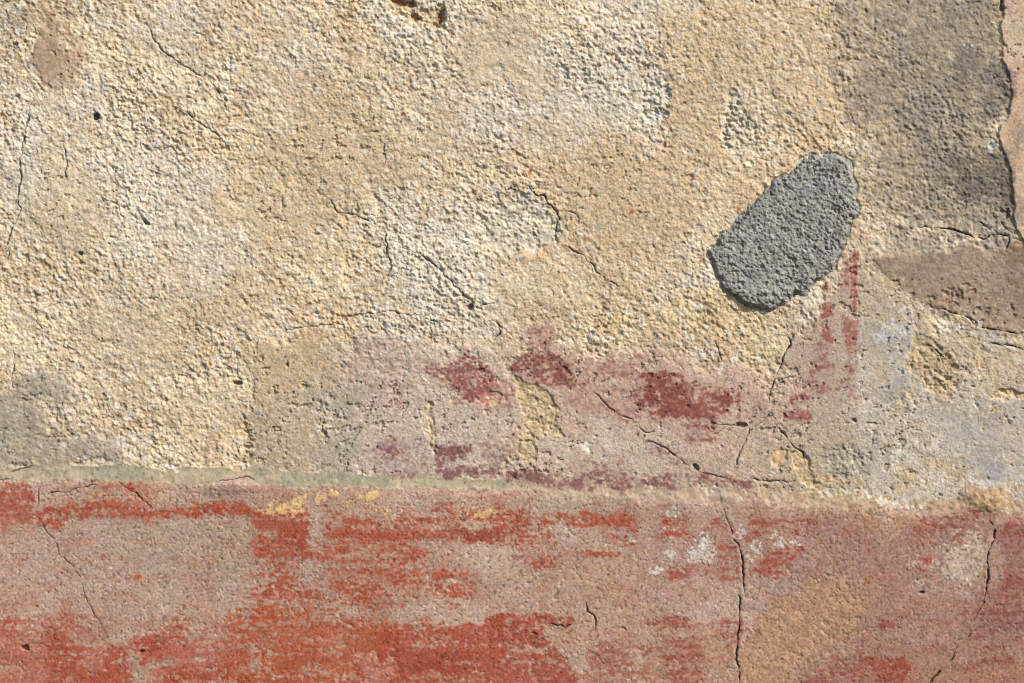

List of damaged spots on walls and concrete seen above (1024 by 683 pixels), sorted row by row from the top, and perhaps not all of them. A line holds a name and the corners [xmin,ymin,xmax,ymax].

crack [317,190,521,341]
crack [508,185,618,287]
crack [595,324,804,488]
peeling [0,479,761,683]
crack [724,508,746,680]
peeling [663,513,823,585]
peeling [794,506,1024,683]
crack [930,520,996,683]